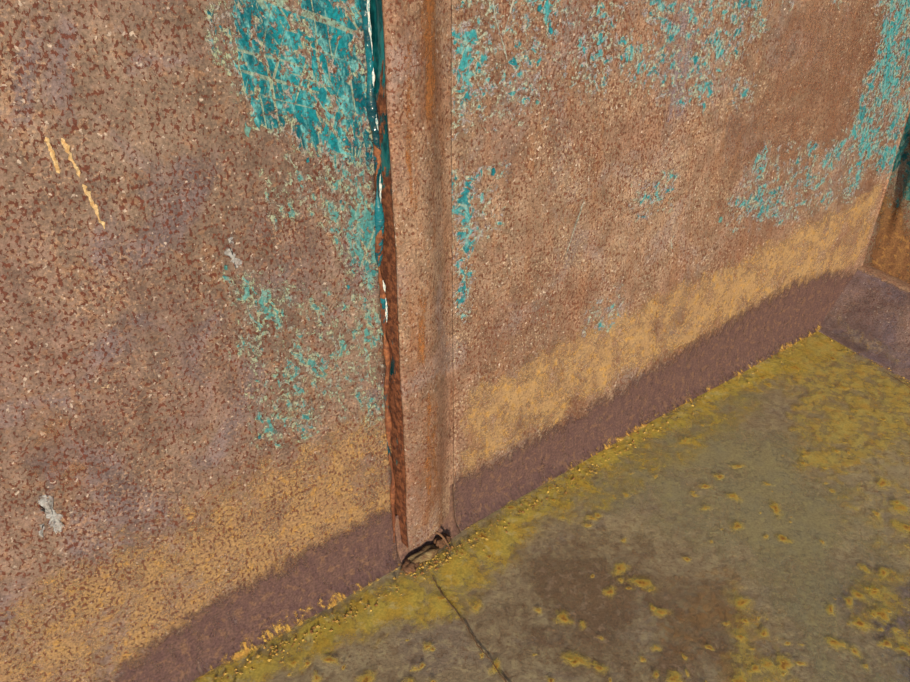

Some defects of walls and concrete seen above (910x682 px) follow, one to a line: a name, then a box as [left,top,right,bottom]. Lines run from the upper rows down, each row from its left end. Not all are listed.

peeling [204,0,386,450]
peeling [452,162,511,323]
peeling [581,284,624,337]
peeling [452,0,773,141]
peeling [628,169,681,223]
corrosion [464,186,910,469]
peeling [718,0,910,235]
corrosion [0,417,391,682]
crack [432,577,507,682]
corrosion [197,326,910,682]